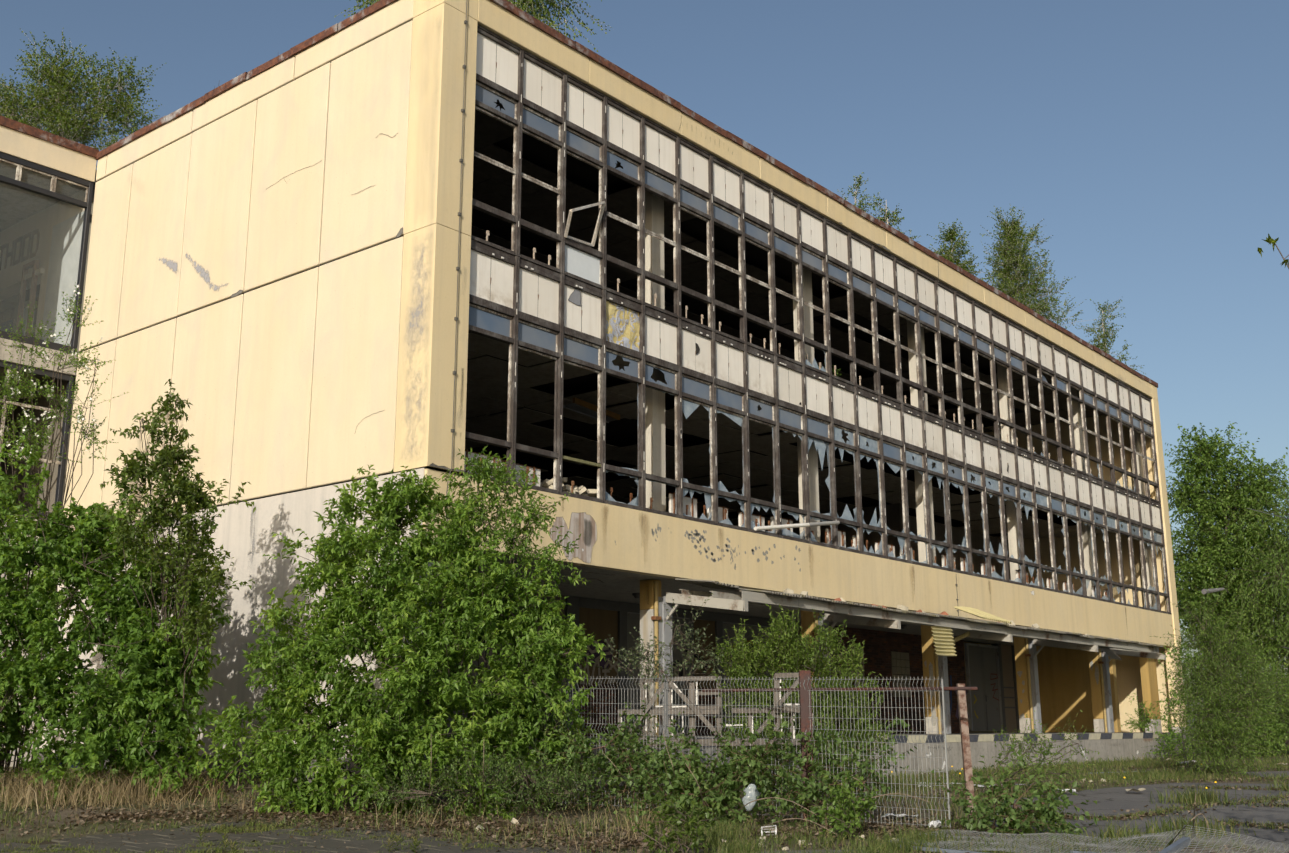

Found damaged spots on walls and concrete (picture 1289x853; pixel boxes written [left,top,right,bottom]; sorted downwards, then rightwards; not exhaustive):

peeling [684,529,801,571]